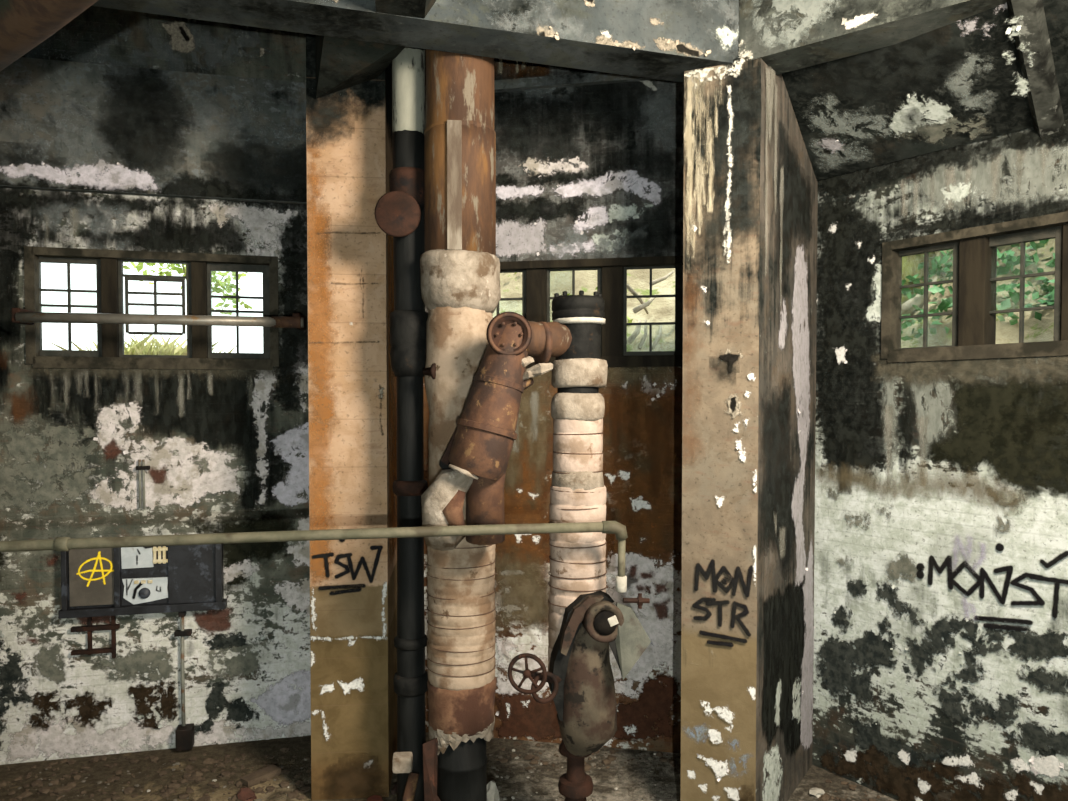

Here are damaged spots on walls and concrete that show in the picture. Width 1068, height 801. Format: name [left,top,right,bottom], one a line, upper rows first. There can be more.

peeling [496,156,661,258]
damp [684,0,753,262]
damp [766,68,784,226]
damp [901,146,1068,213]
damp [28,367,276,442]
peeling [89,401,242,511]
corrosion [495,428,549,630]
corrosion [602,384,678,558]
damp [823,377,1017,507]
peeling [775,246,1068,801]
peeling [0,631,180,764]
peeling [193,516,387,747]